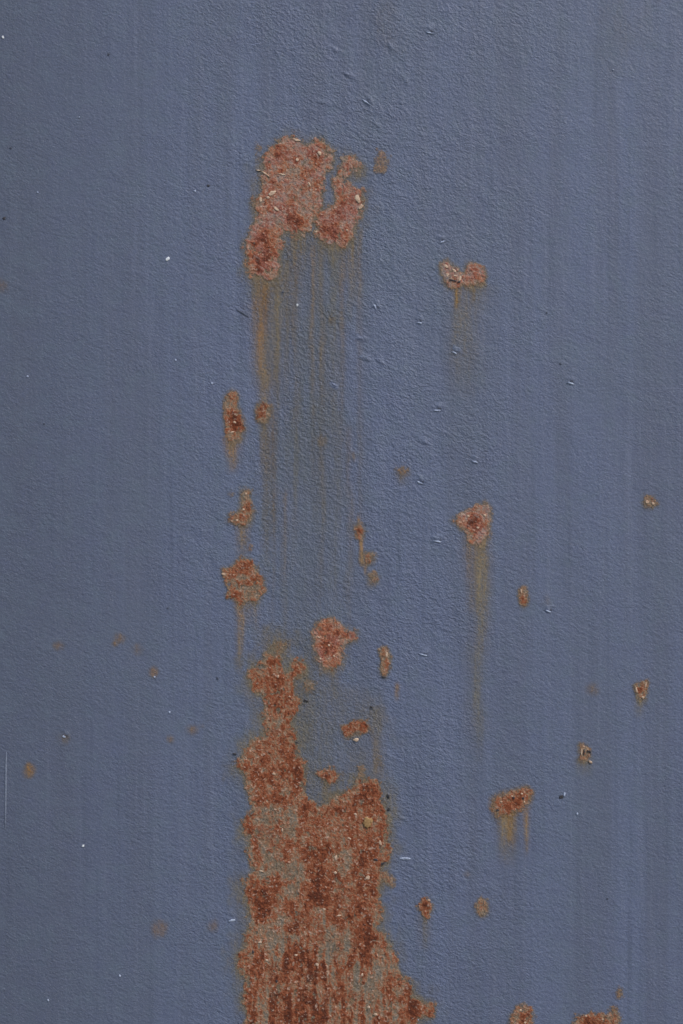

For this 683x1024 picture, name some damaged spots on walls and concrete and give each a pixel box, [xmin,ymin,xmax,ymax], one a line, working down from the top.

corrosion [240,134,389,383]
corrosion [439,257,487,307]
corrosion [223,390,273,461]
corrosion [222,489,267,622]
corrosion [354,518,379,583]
corrosion [453,501,494,633]
corrosion [517,585,530,606]
corrosion [633,679,650,703]
corrosion [233,616,437,1024]
corrosion [490,785,533,842]
corrosion [509,1002,534,1024]
corrosion [571,988,623,1024]